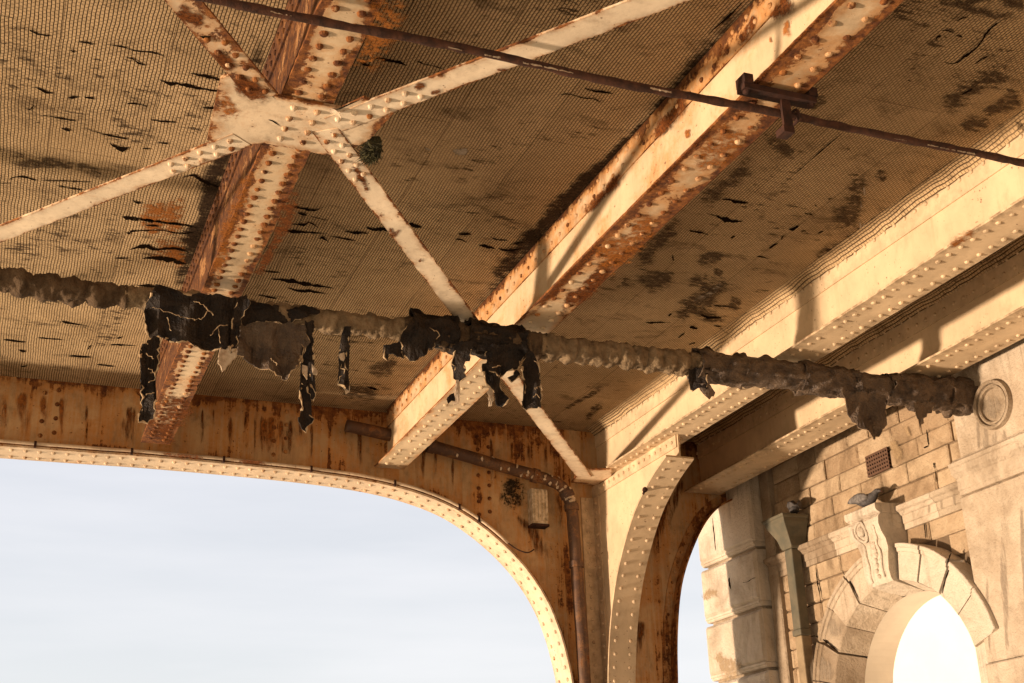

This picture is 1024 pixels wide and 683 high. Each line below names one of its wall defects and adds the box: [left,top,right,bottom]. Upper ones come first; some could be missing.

corrosion [754,0,829,84]
crack [936,16,1009,64]
corrosion [216,52,266,116]
water stain [942,65,1021,132]
corrosion [584,174,621,214]
water stain [490,25,730,294]
corrosion [646,122,744,193]
water stain [818,169,887,257]
corrosion [533,215,654,316]
water stain [676,253,741,322]
spalling [890,442,901,459]
water stain [500,478,524,508]